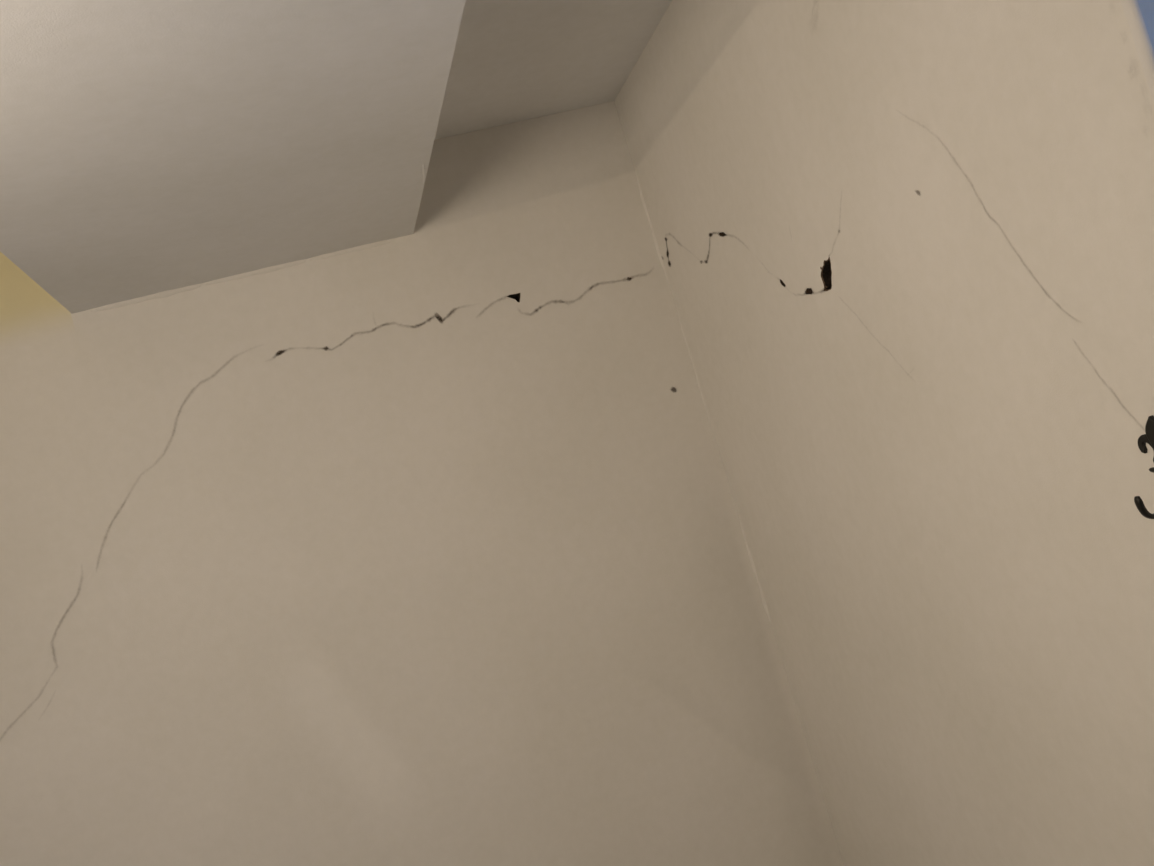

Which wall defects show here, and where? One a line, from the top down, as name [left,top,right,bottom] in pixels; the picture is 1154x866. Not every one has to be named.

crack [780,279,824,294]